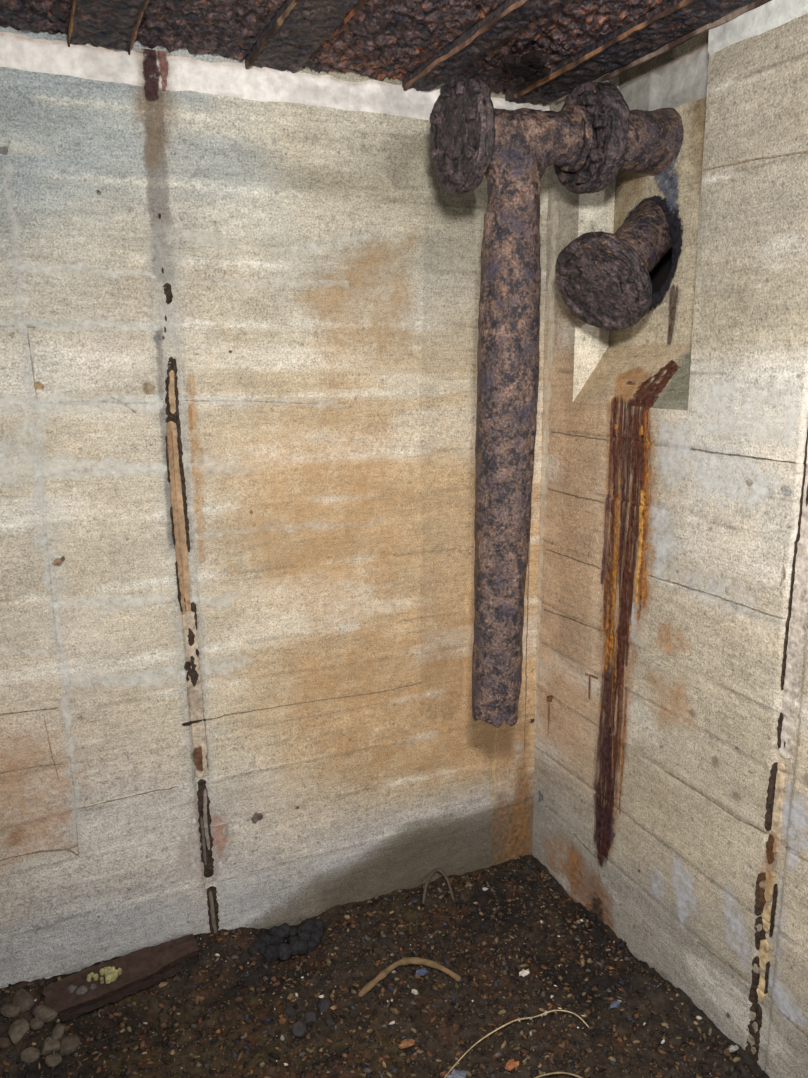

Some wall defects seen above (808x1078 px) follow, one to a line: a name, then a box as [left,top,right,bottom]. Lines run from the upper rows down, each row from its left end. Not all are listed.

rust [143,49,168,101]
rust [488,50,551,82]
leakage [182,451,241,472]
rust [585,360,680,867]